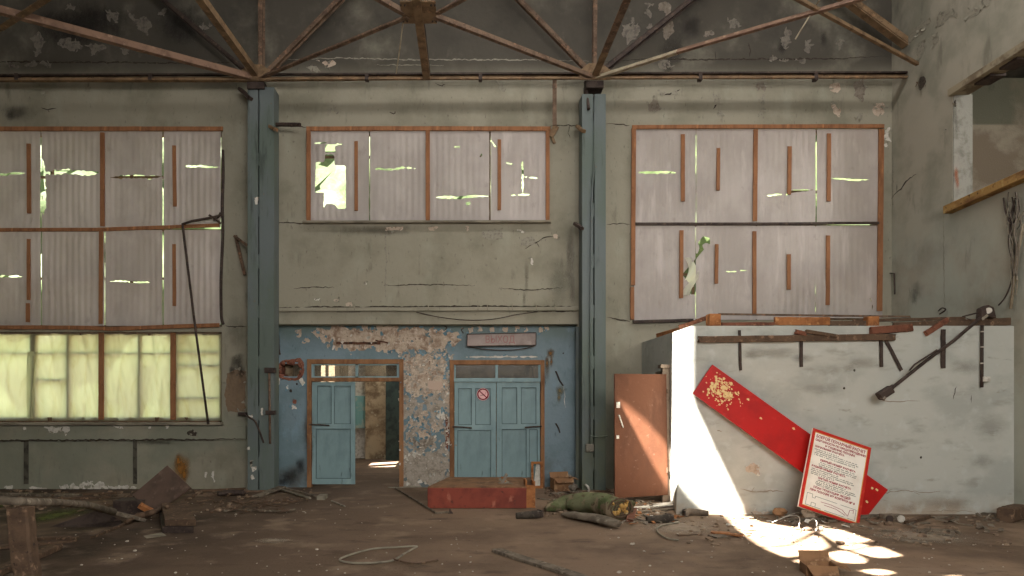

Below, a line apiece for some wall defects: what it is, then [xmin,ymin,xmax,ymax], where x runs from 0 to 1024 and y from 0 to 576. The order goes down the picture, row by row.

peeling [30,31,106,57]
peeling [105,8,167,36]
peeling [621,2,674,45]
crack [892,146,916,213]
crack [279,284,577,334]
peeling [223,367,264,419]
peeling [295,325,509,486]
peeling [29,480,136,489]